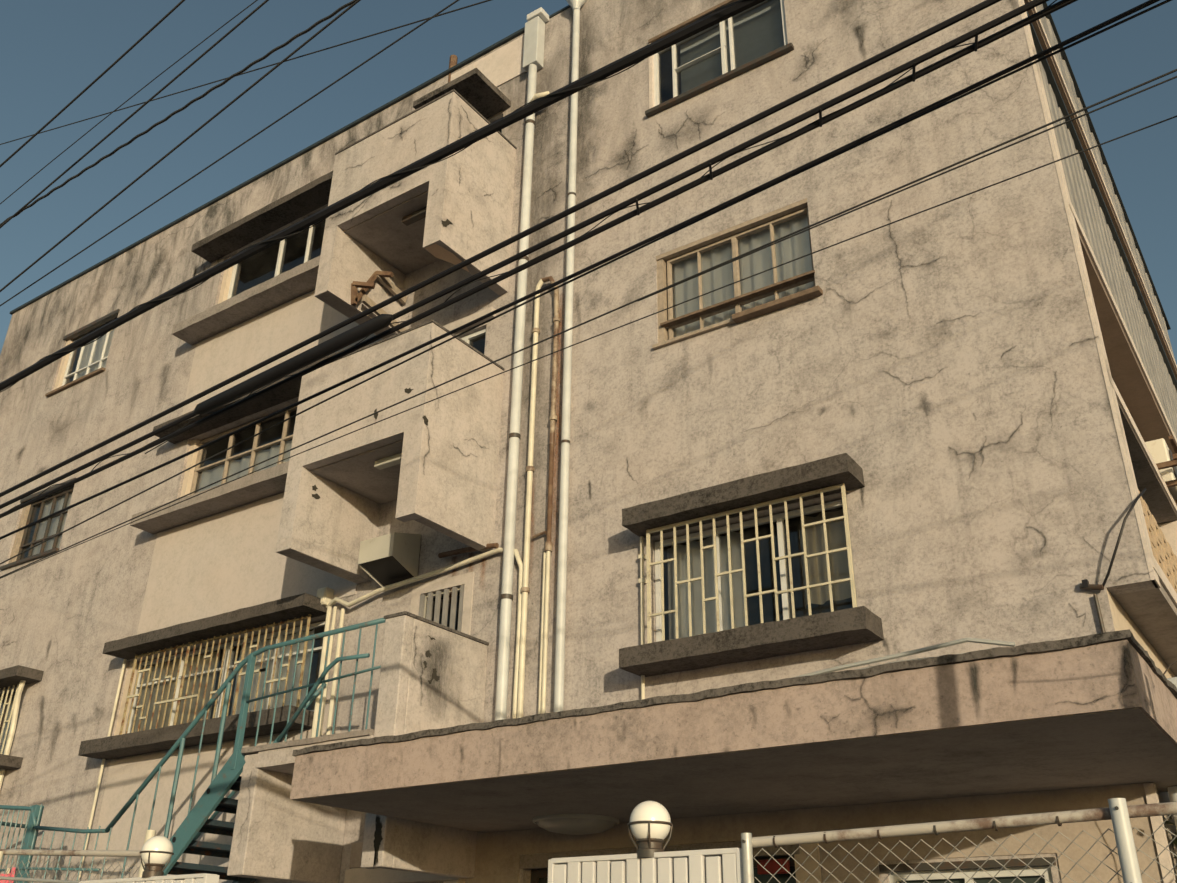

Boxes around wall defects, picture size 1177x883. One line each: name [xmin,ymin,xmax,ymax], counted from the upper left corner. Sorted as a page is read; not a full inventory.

damp [970,665,979,701]